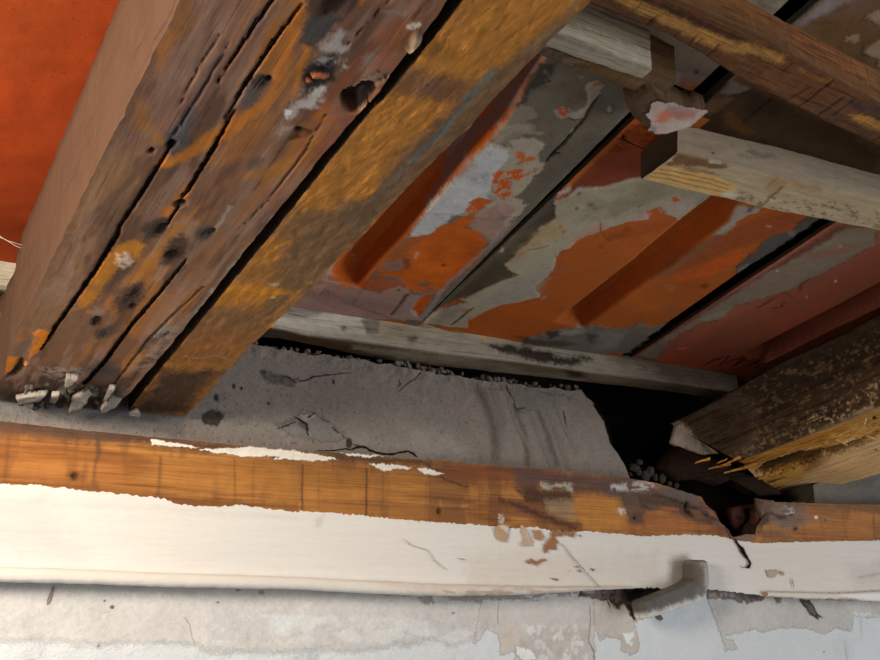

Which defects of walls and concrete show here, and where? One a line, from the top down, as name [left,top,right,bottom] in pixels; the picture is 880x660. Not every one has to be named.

crack [278,412,417,457]
peeling [495,524,581,566]
peeling [0,582,664,660]